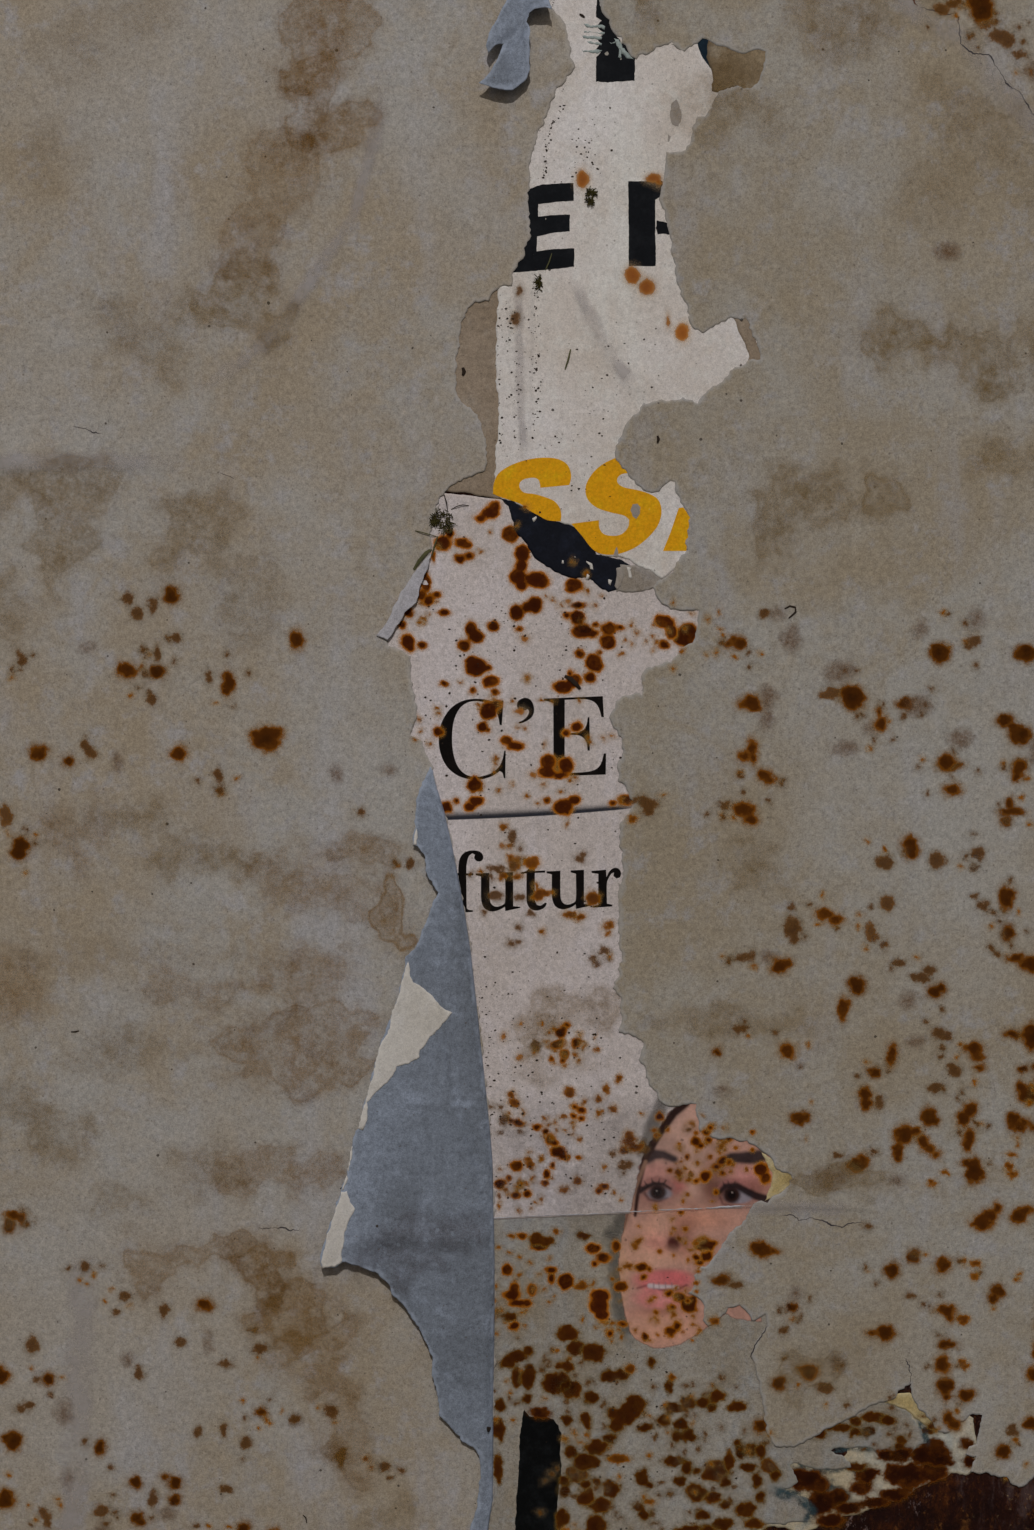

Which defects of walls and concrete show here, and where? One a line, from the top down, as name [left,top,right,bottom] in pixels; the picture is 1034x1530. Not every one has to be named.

peeling [479,0,552,90]
peeling [706,40,766,92]
crack [913,0,1034,115]
corrosion [926,0,1034,75]
peeling [446,285,505,499]
peeling [608,564,667,593]
corrosion [398,500,764,827]
corrosion [818,666,933,751]
corrosion [996,713,1034,827]
corrosion [970,877,1034,974]
corrosion [721,892,1034,1187]
peeling [320,767,495,1530]